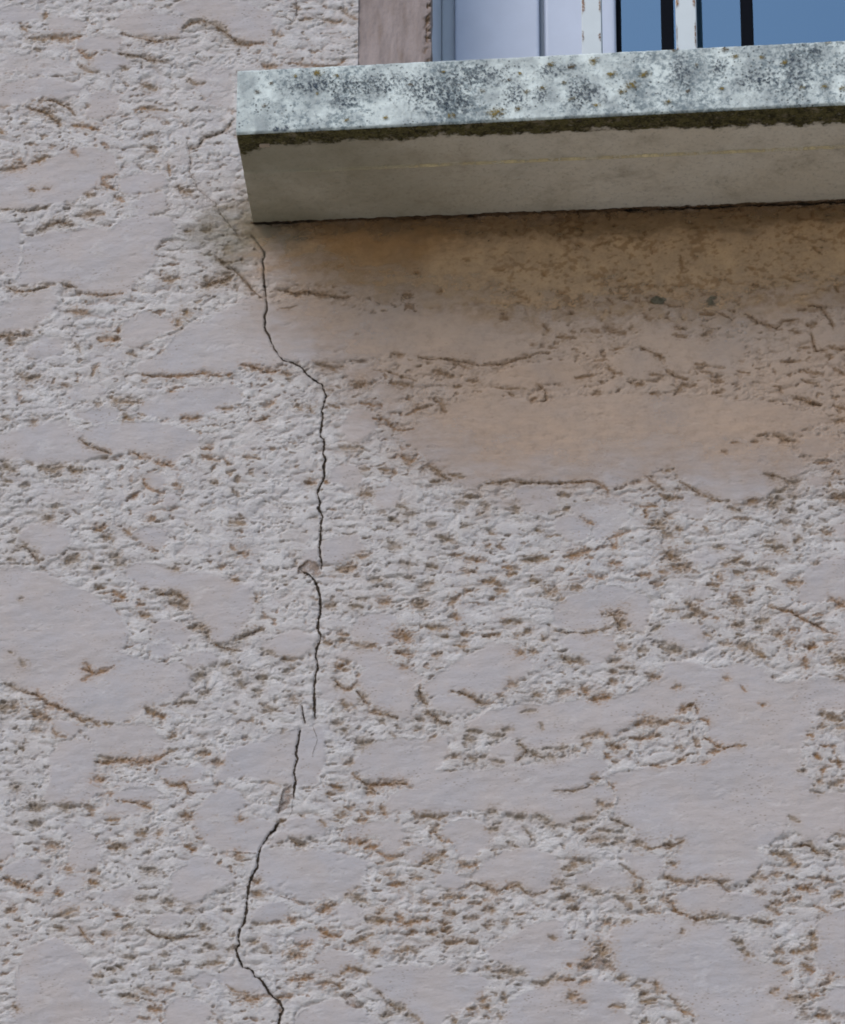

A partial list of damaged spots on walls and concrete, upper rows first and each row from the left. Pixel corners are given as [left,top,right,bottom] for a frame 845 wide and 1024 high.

crack [188,120,327,1024]